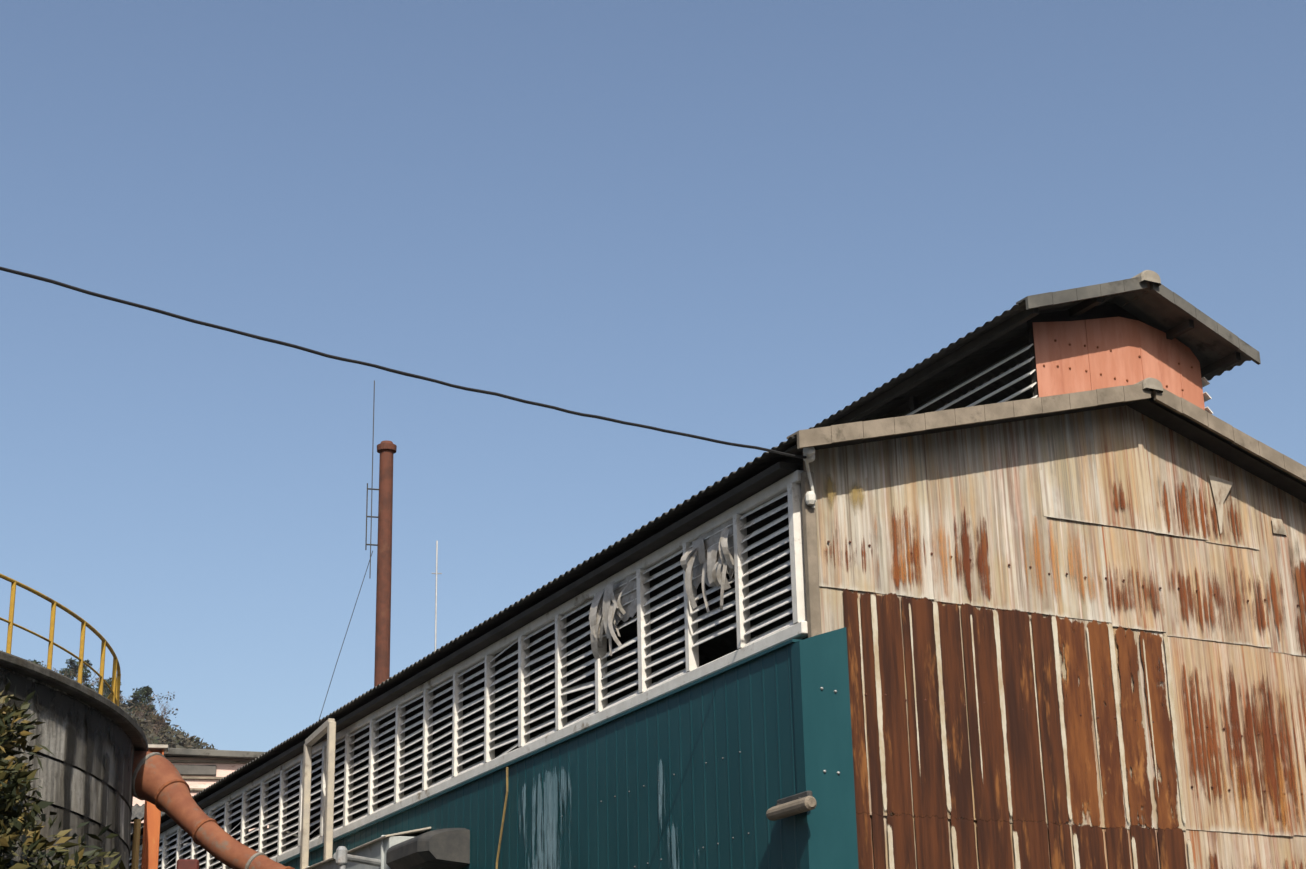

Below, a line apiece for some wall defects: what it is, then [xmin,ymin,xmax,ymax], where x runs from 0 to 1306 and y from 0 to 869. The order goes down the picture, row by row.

rust [1113,481,1131,510]
rust [1157,482,1242,541]
rust [826,528,877,571]
rust [843,506,1306,869]
damp [0,670,133,869]